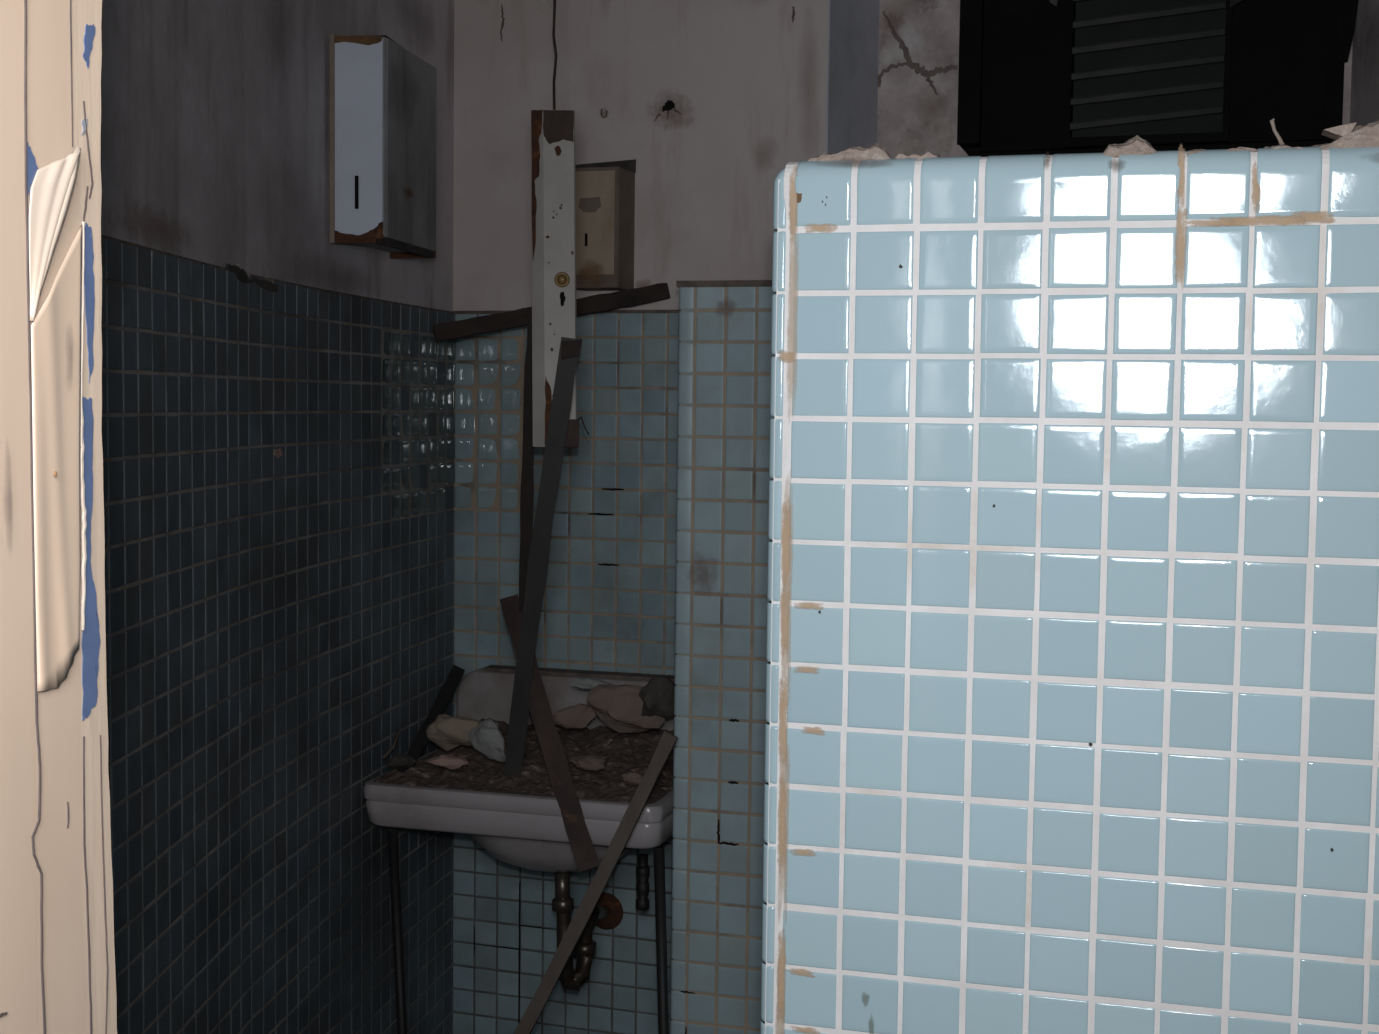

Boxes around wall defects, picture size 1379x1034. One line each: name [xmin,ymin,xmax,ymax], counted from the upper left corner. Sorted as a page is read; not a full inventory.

crack [877,11,958,95]
peeling [1321,122,1357,140]
peeling [28,146,87,691]